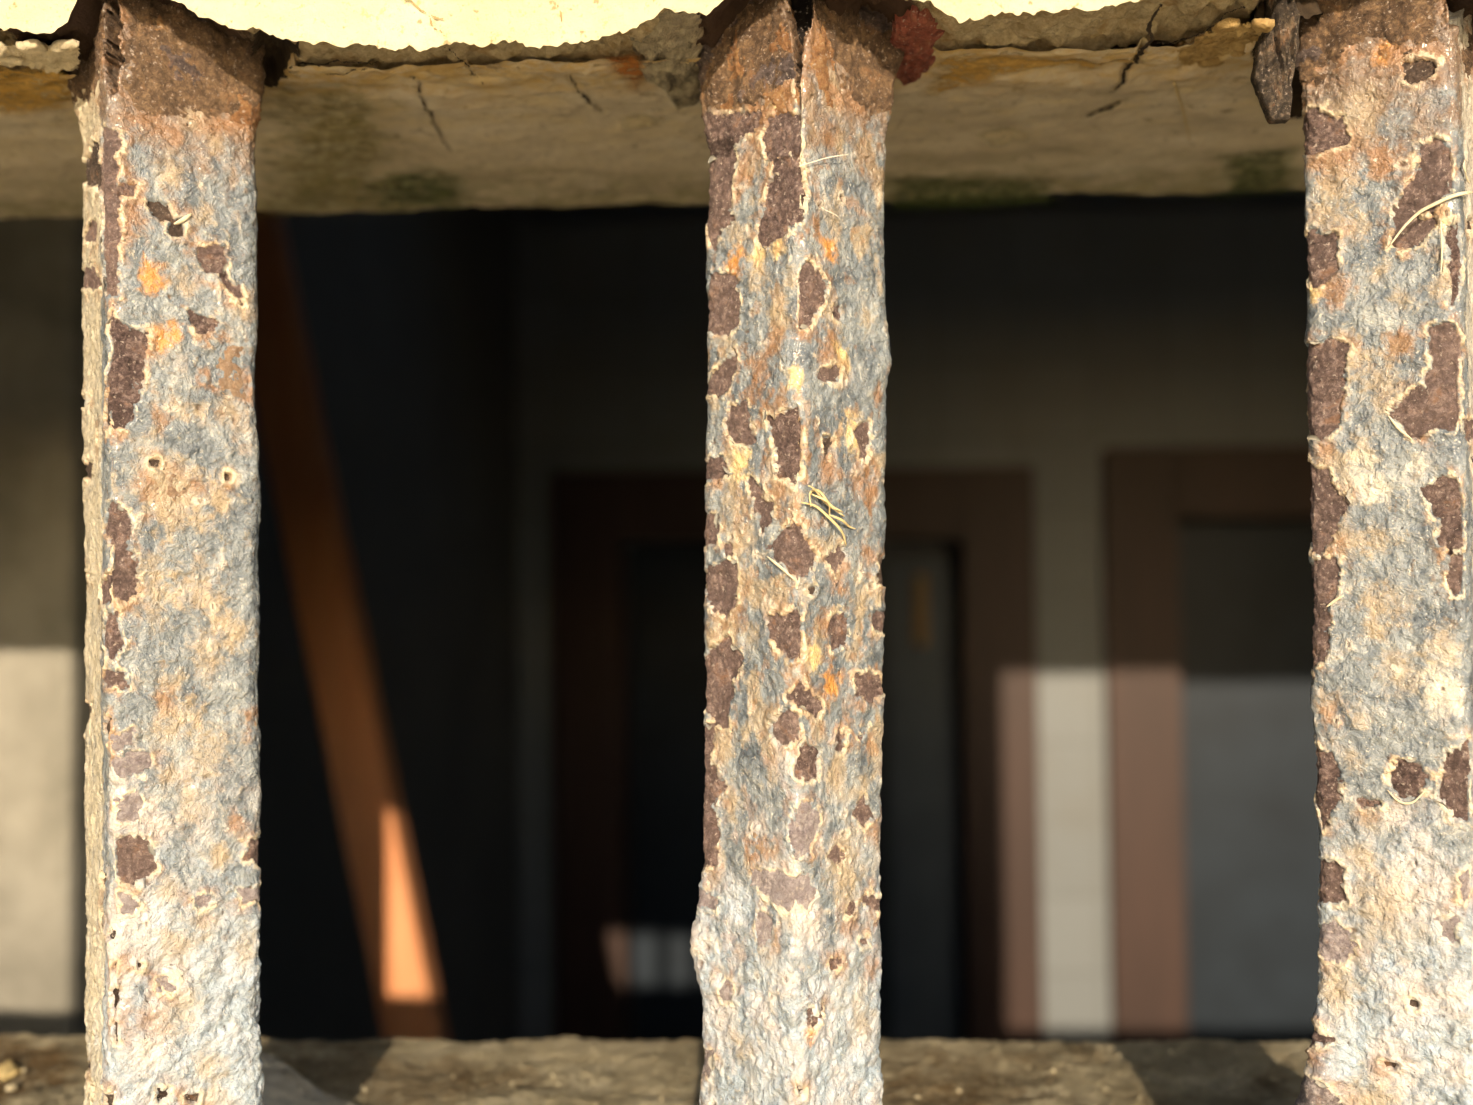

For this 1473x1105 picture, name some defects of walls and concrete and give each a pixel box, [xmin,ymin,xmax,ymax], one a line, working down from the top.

spalling [86,142,102,190]
spalling [146,201,192,237]
crack [289,59,451,151]
corrosion [696,0,905,259]
crack [1085,4,1250,118]
spalling [1402,60,1437,85]
peeling [1389,159,1473,272]
corrosion [83,127,149,429]
corrosion [1389,138,1473,442]
corrosion [706,263,845,580]
spalling [822,436,832,456]
corrosion [703,512,744,869]